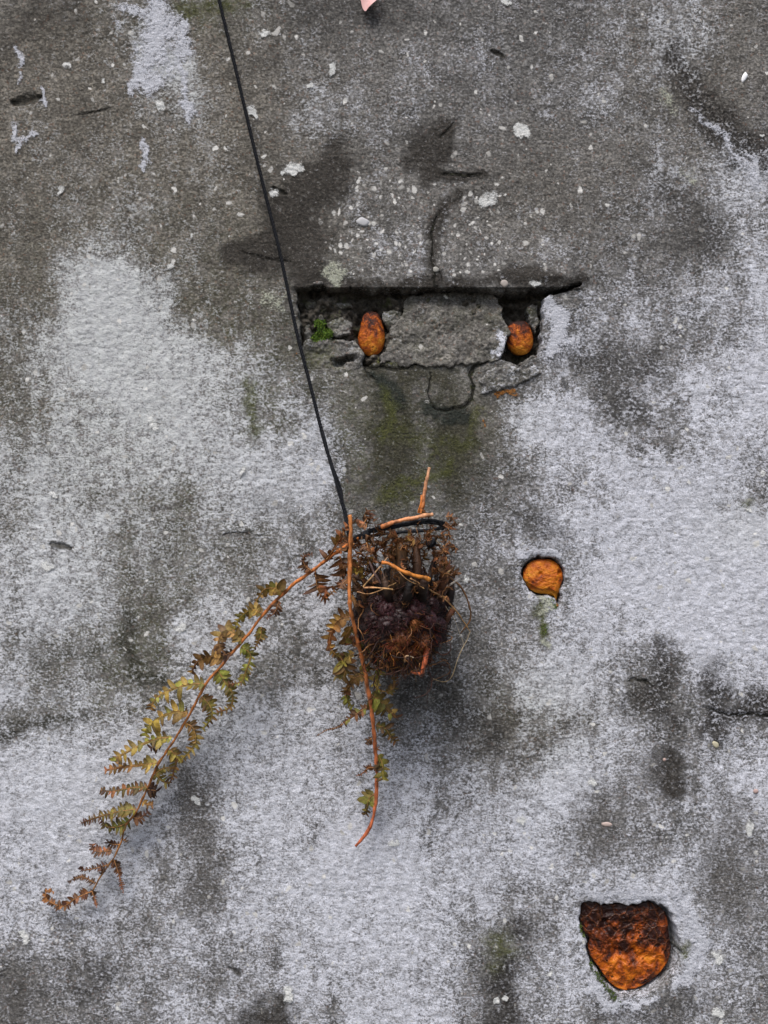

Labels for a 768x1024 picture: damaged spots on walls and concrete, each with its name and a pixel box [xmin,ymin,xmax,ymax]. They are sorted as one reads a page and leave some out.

crack [443,170,481,178]
crack [430,210,443,287]
water stain [220,117,659,377]
rust [358,311,385,356]
spalling [297,281,576,394]
rust [506,321,533,356]
rust [522,559,563,607]
water stain [621,638,679,724]
water stain [650,748,687,800]
rust [580,900,671,990]